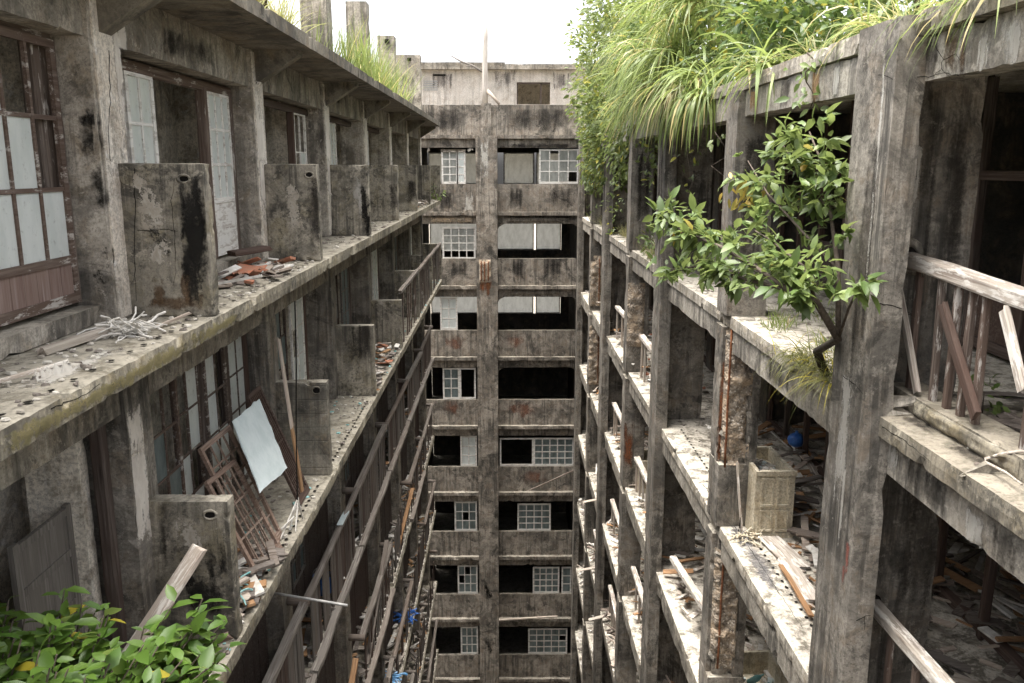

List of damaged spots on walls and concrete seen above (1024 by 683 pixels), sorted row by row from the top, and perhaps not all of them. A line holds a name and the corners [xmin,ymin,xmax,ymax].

leakage [81,112,103,151]
leakage [93,172,109,203]
crack [108,50,178,301]
leakage [150,177,207,310]
leakage [353,182,371,233]
peeling [127,404,152,541]
corrosion [623,427,633,464]
corrosion [716,362,725,459]